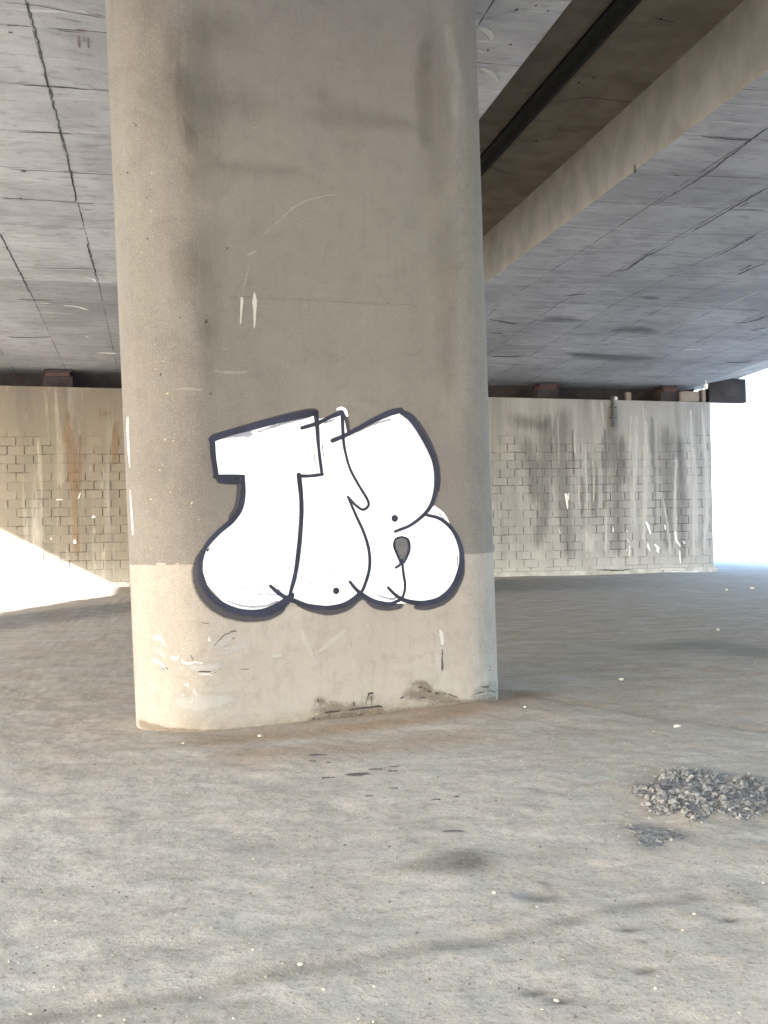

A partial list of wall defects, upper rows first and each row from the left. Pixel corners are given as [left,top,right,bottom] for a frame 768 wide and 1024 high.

crack [5,2,113,278]
crack [634,129,766,205]
crack [0,234,51,301]
crack [622,177,767,274]